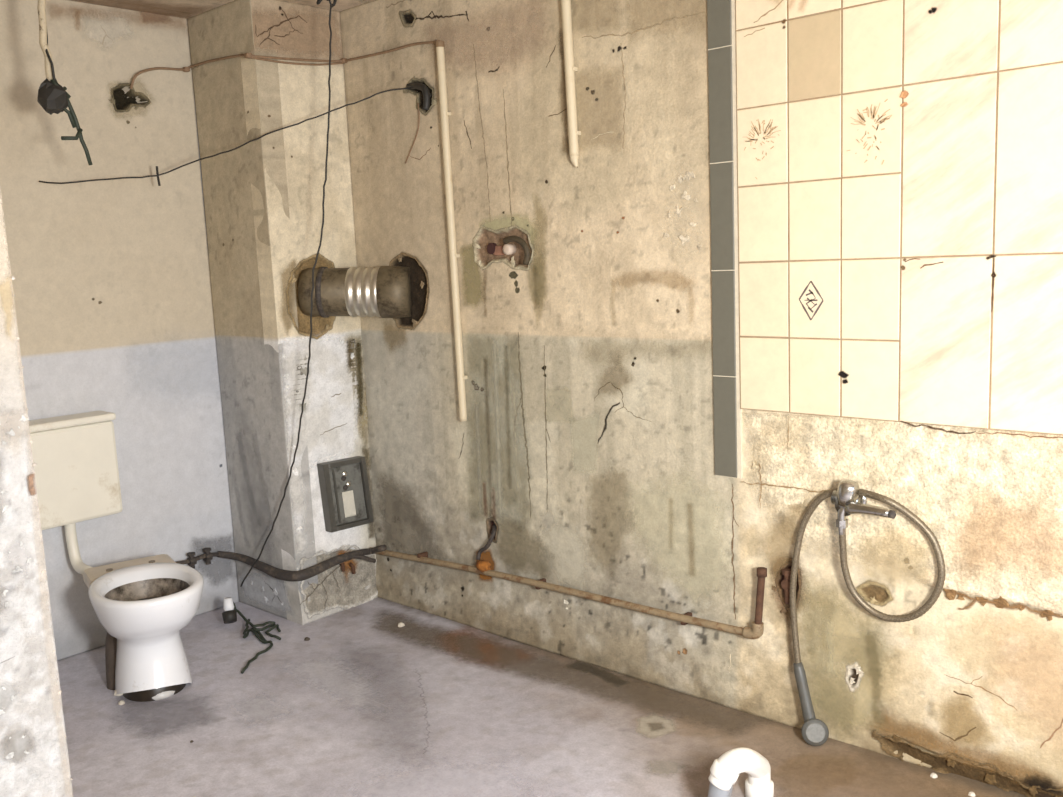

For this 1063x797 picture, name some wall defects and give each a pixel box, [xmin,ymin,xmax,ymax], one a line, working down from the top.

crack [594,382,651,442]
crack [900,421,1063,438]
crack [945,590,1063,618]
crack [944,674,1017,710]
flaking render [872,730,1063,797]